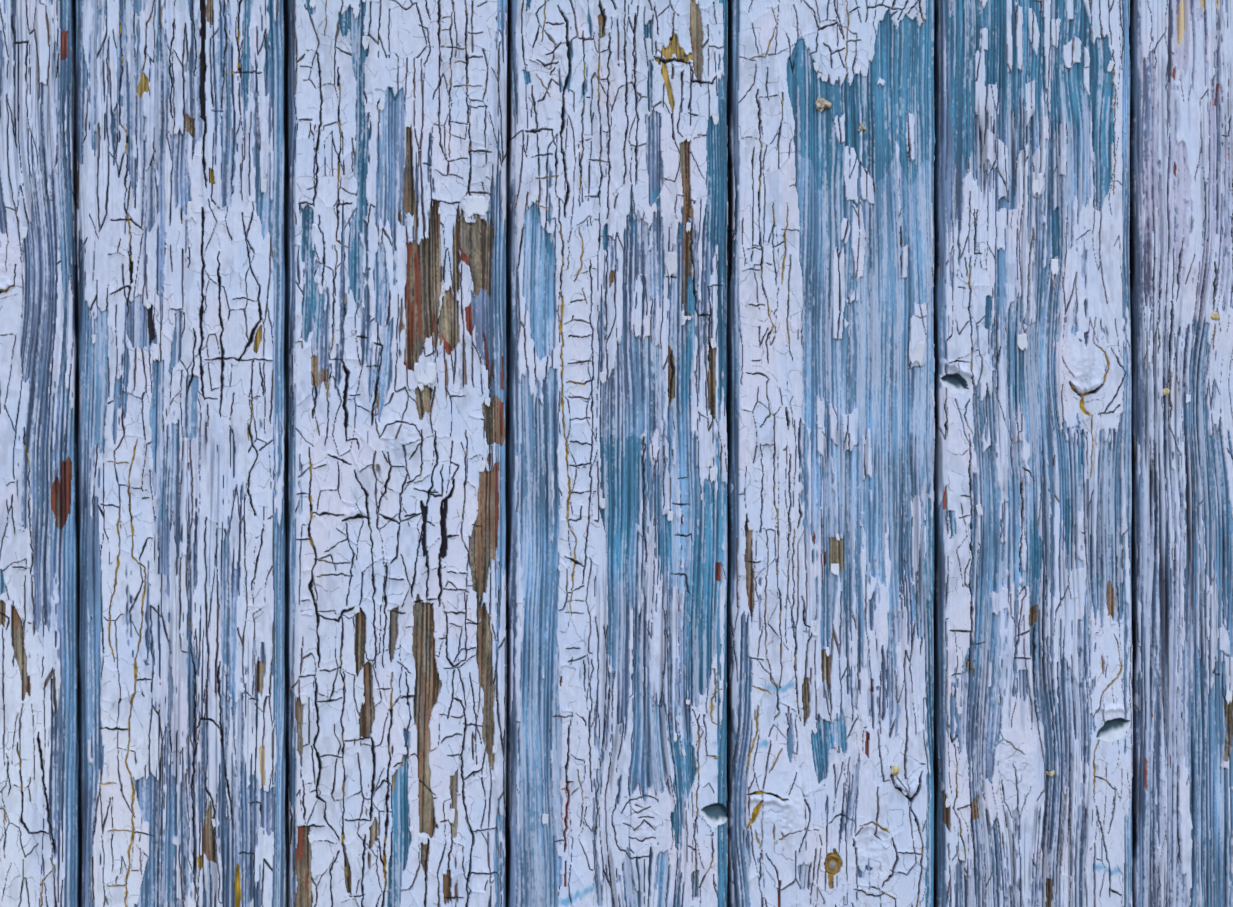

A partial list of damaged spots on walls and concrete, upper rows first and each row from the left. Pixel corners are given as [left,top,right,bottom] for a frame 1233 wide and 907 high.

crack [0,0,60,299]
crack [0,314,63,907]
crack [50,0,279,907]
peeling [298,204,327,345]
peeling [387,595,458,907]
peeling [469,375,563,907]
peeling [600,112,726,587]
peeling [655,455,718,851]
peeling [811,709,848,784]
peeling [787,0,982,503]
peeling [1084,35,1116,212]
peeling [1182,315,1233,658]